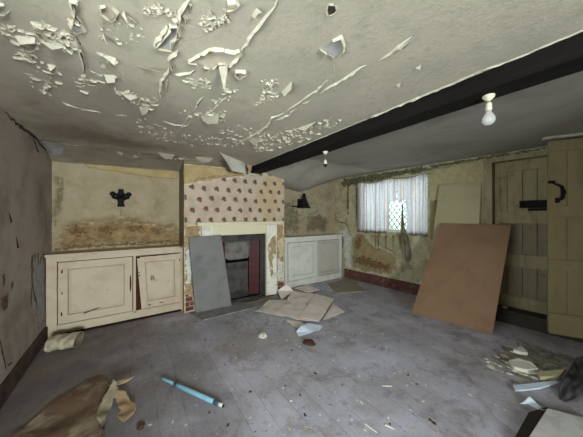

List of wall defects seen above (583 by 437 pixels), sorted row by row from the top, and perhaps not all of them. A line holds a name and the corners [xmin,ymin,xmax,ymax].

peeling [98,5,146,45]
peeling [142,2,182,52]
peeling [197,0,240,33]
peeling [325,3,339,17]
peeling [0,20,87,96]
peeling [73,30,583,163]
crack [5,112,48,153]
flaking render [32,256,45,329]
water stain [55,218,179,251]
flaking render [184,226,200,313]
flaking render [268,225,284,292]
water stain [352,234,412,274]